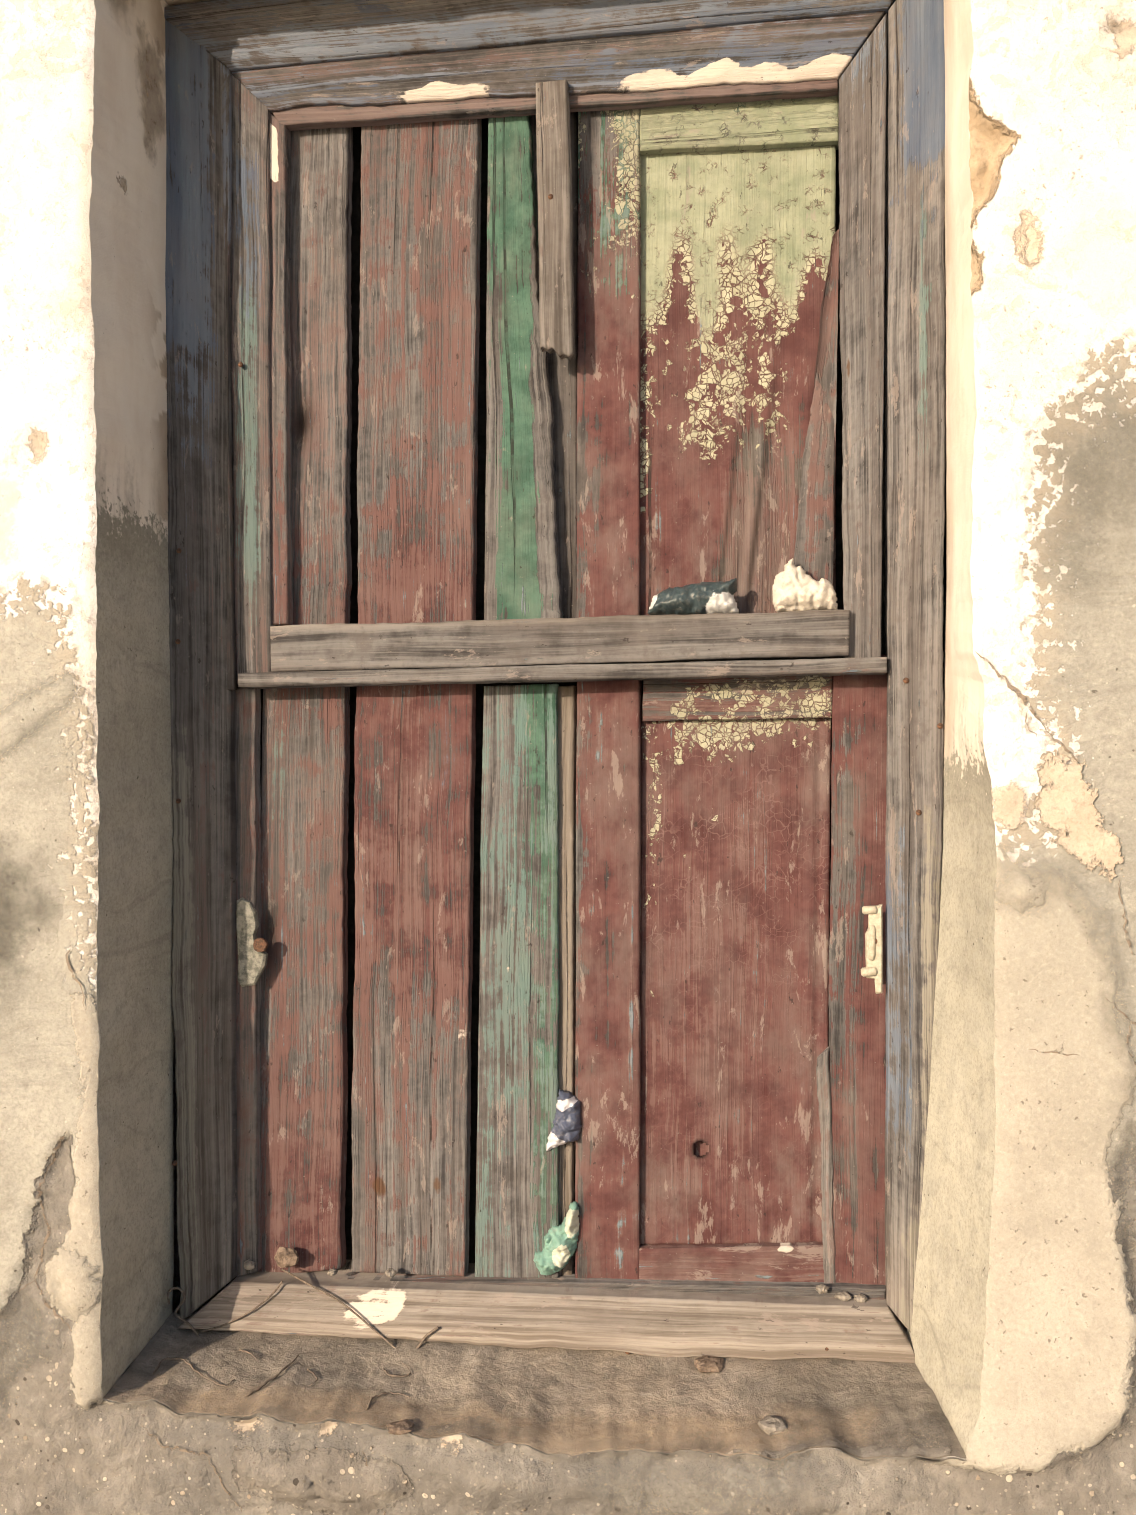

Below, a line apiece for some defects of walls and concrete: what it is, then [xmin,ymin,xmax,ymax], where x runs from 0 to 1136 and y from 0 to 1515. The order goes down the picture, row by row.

spalling [969,77,1021,296]
spalling [27,427,49,464]
peeling [991,335,1136,1063]
spalling [0,577,1136,1515]
crack [19,1132,72,1332]